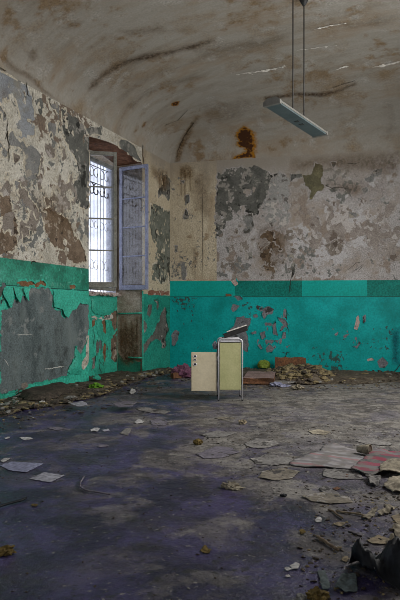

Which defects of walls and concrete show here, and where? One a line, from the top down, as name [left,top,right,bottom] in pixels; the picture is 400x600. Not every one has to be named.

peeling [0,71,102,266]
peeling [0,278,141,396]
leakage [104,43,203,75]
peeling [144,172,179,353]
rust [233,126,256,159]
spalling [214,161,400,353]